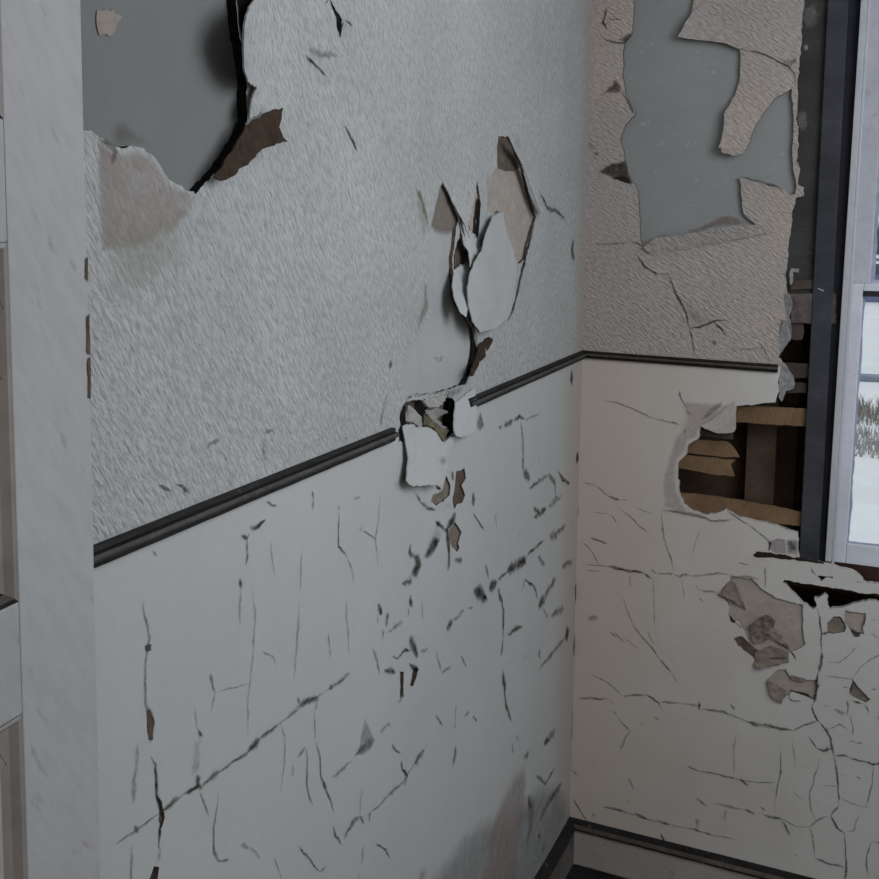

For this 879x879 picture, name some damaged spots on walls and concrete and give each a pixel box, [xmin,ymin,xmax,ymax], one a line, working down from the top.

peeling [80,0,288,194]
peeling [601,0,797,256]
peeling [399,136,561,584]
crack [619,242,724,350]
spalling [666,401,737,511]
crack [145,617,155,740]
crack [475,529,575,716]
spalling [721,576,817,704]
spalling [823,610,866,637]
crack [750,616,879,877]
crack [131,761,227,879]
leakage [445,780,562,879]